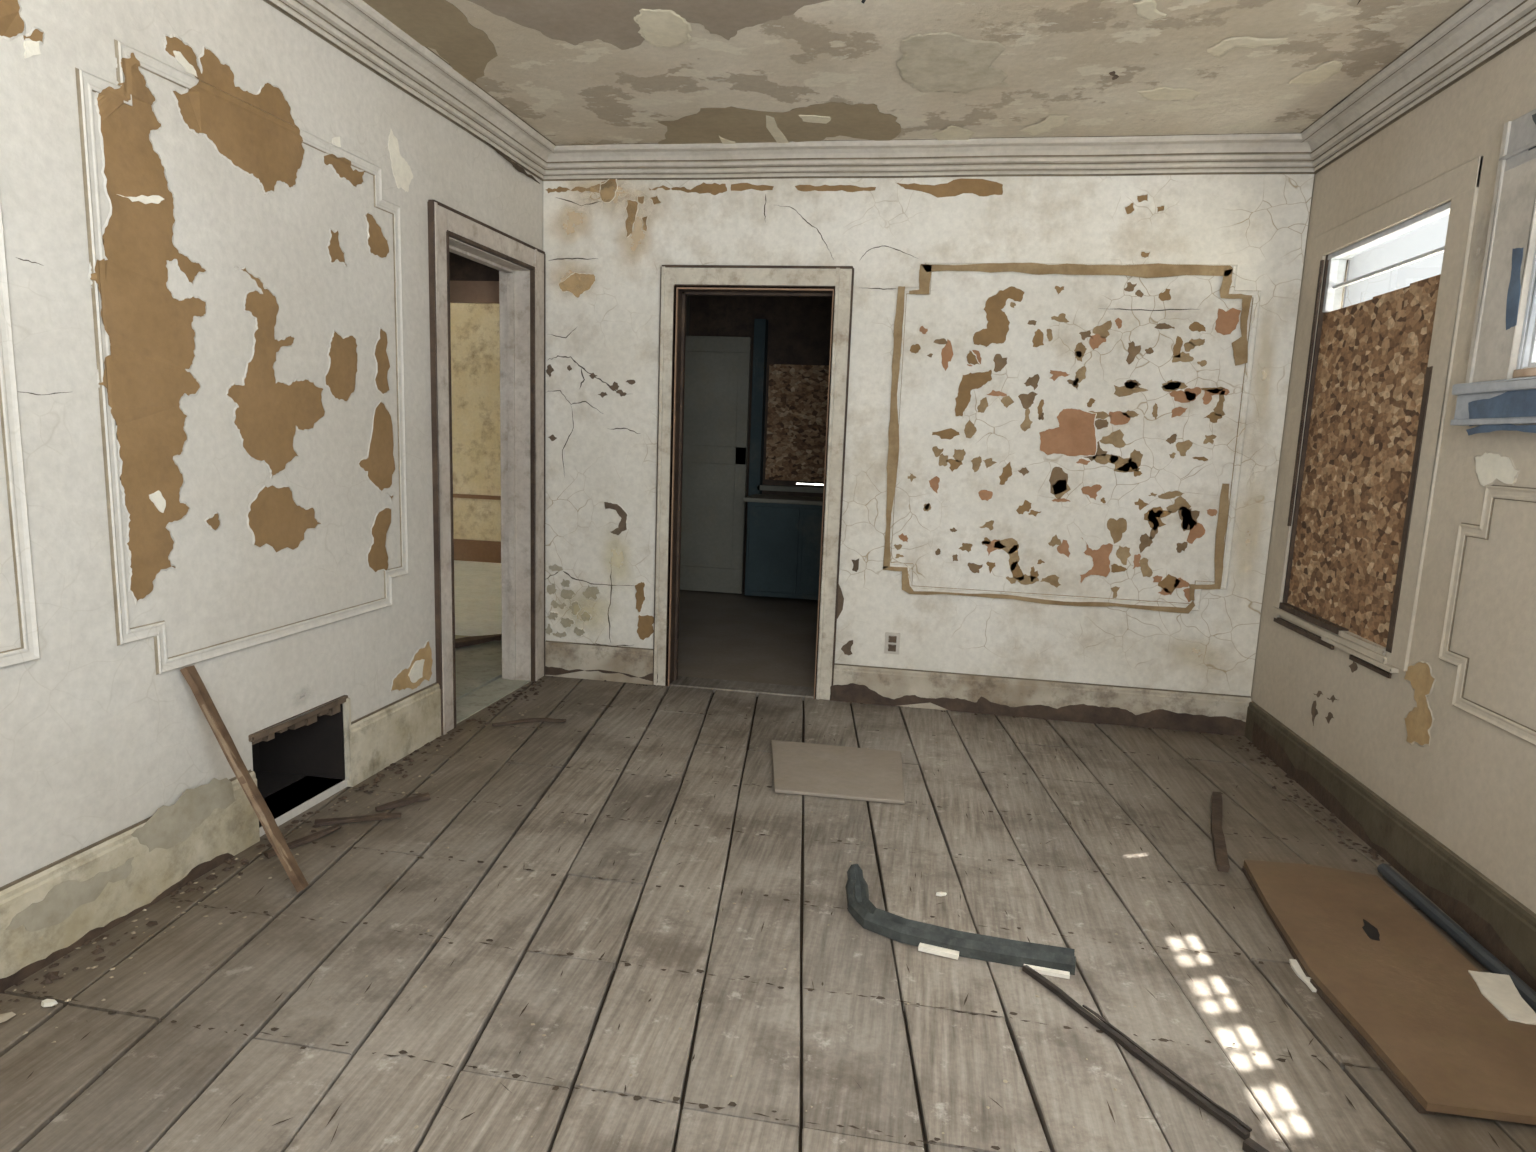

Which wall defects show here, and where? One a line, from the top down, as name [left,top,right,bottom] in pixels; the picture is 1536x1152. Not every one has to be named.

peeling [0,0,45,58]
peeling [546,179,774,238]
peeling [897,178,1003,198]
peeling [1124,194,1165,216]
peeling [88,33,365,605]
peeling [225,265,396,573]
peeling [883,250,1252,614]
peeling [1403,660,1436,747]